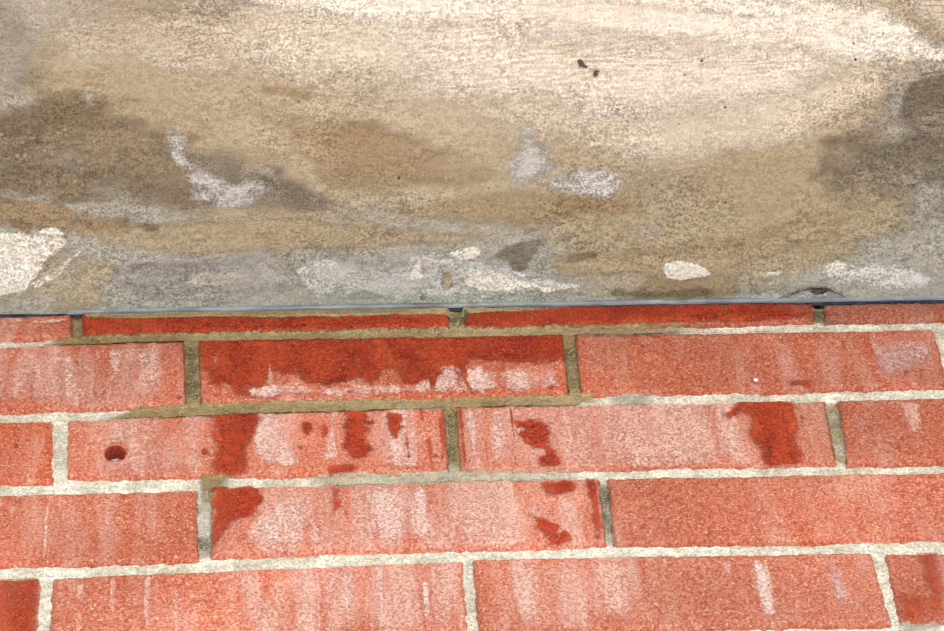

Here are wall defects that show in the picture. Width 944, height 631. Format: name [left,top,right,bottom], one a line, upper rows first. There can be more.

water stain [0,0,944,300]
water stain [874,341,927,372]
water stain [13,261,832,553]
water stain [826,405,845,461]
water stain [903,404,918,430]